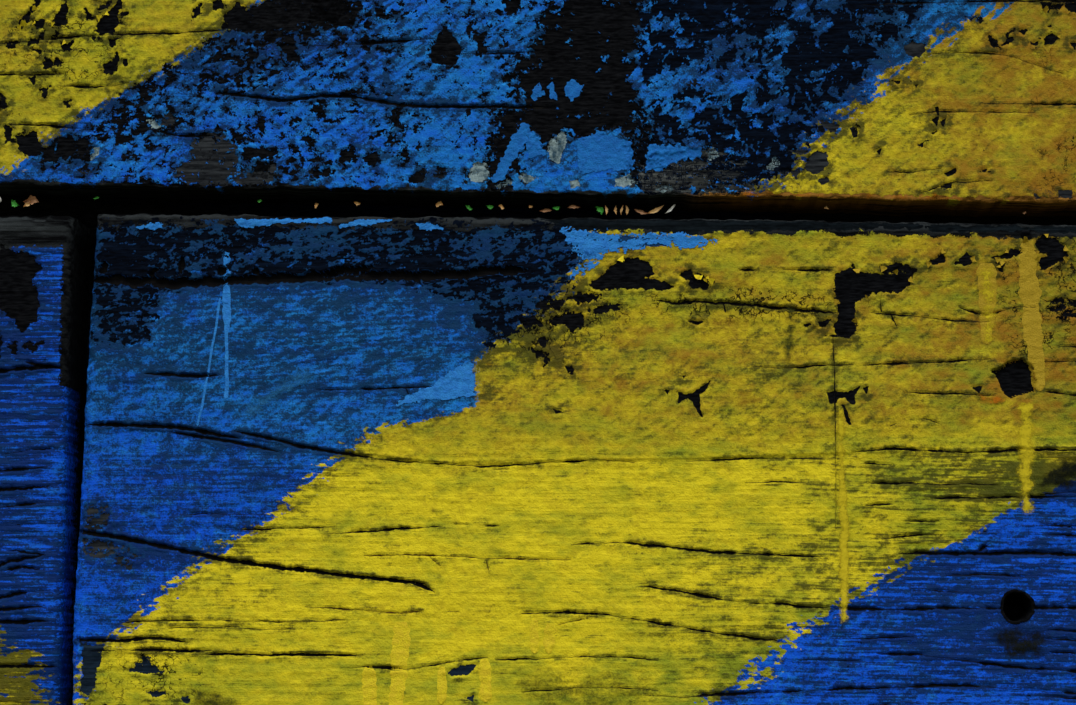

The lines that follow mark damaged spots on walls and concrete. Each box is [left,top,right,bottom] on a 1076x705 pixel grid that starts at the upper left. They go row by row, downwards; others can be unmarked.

peeling [988,0,1076,53]
peeling [918,107,946,147]
peeling [90,216,1076,367]
crack [145,371,219,379]
crack [316,386,432,395]
crack [86,423,635,470]
crack [521,345,1076,705]
crack [79,513,823,670]
crack [0,662,57,670]